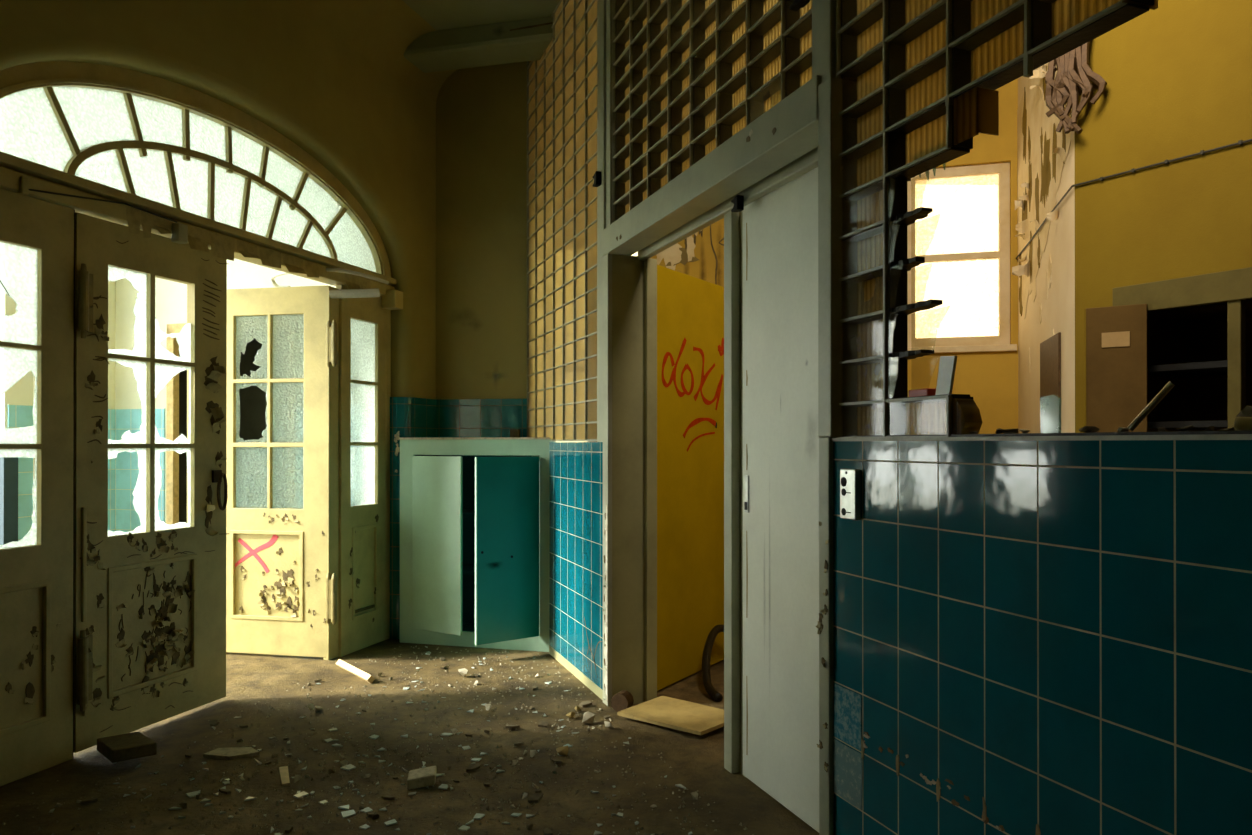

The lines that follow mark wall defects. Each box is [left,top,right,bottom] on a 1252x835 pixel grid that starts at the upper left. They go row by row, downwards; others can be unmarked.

peeling [815,589,828,634]
spalling [817,683,862,810]